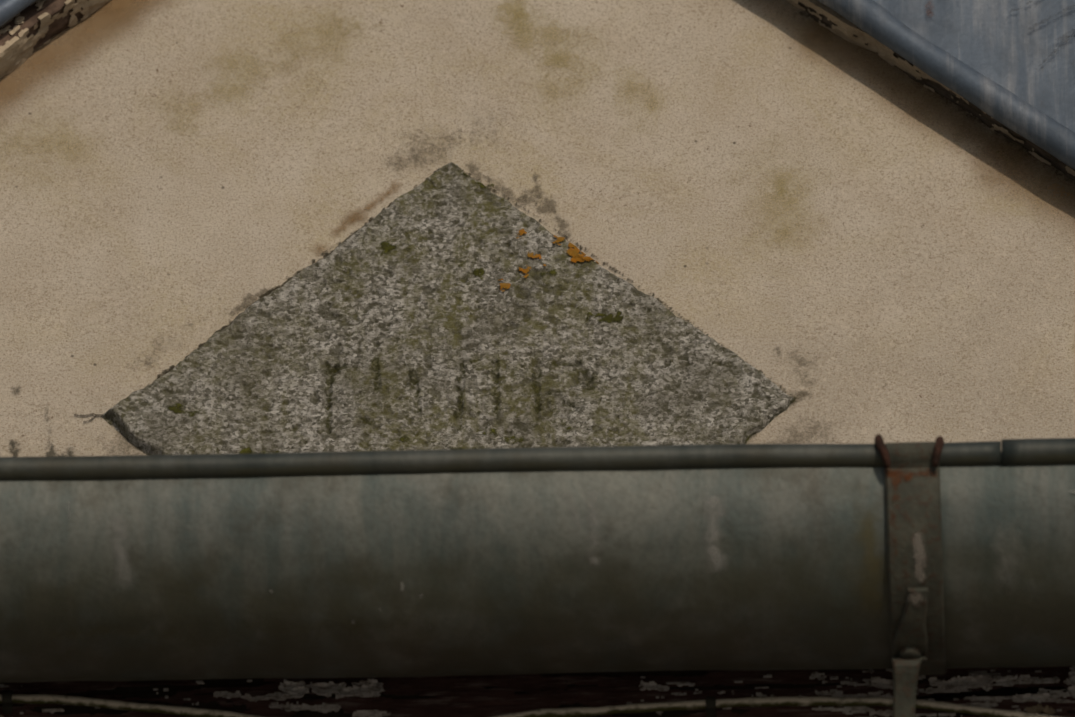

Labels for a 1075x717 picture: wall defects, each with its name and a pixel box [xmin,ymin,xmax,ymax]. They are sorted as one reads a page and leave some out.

damp [0,0,151,104]
peeling [213,678,391,717]
peeling [639,679,694,691]
peeling [815,677,894,717]
peeling [916,666,1075,715]